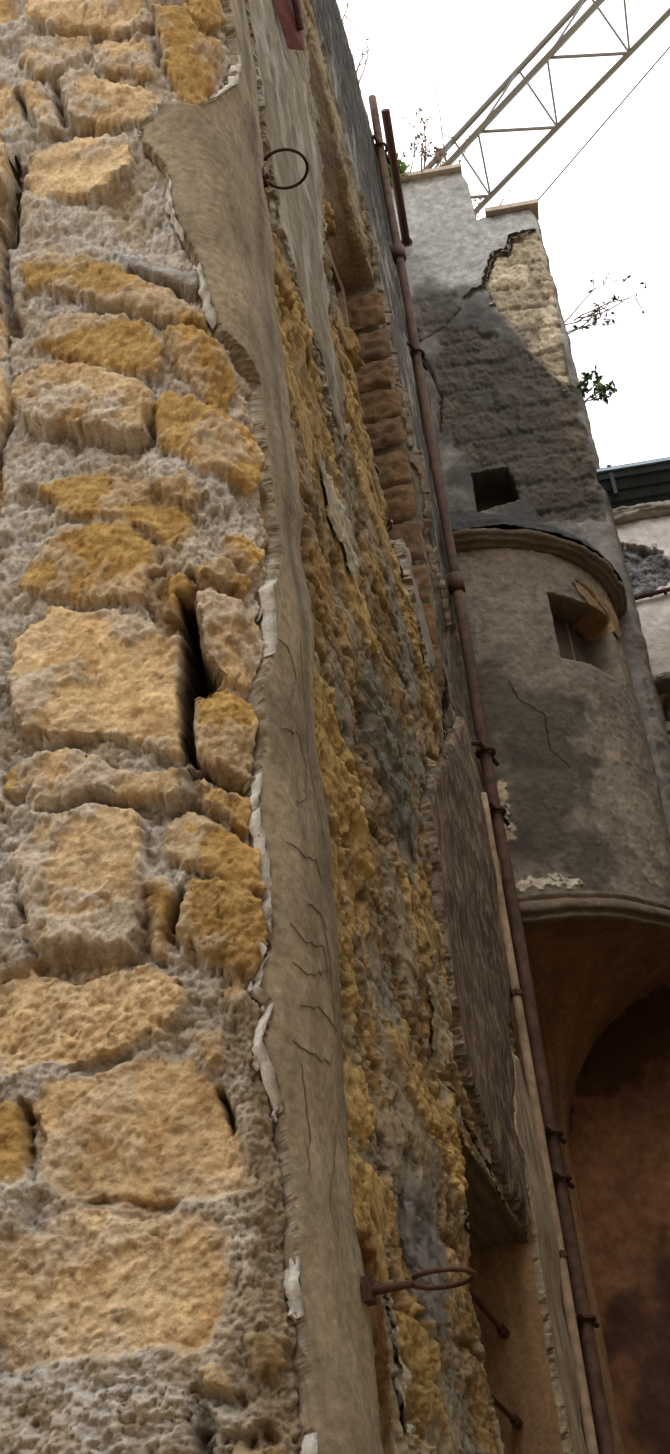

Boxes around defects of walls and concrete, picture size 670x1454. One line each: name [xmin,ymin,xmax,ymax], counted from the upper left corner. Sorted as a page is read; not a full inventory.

flaking render [199,55,242,106]
flaking render [484,231,533,307]
crack [279,639,339,1230]
water stain [569,985,670,1132]
water stain [604,1258,670,1454]